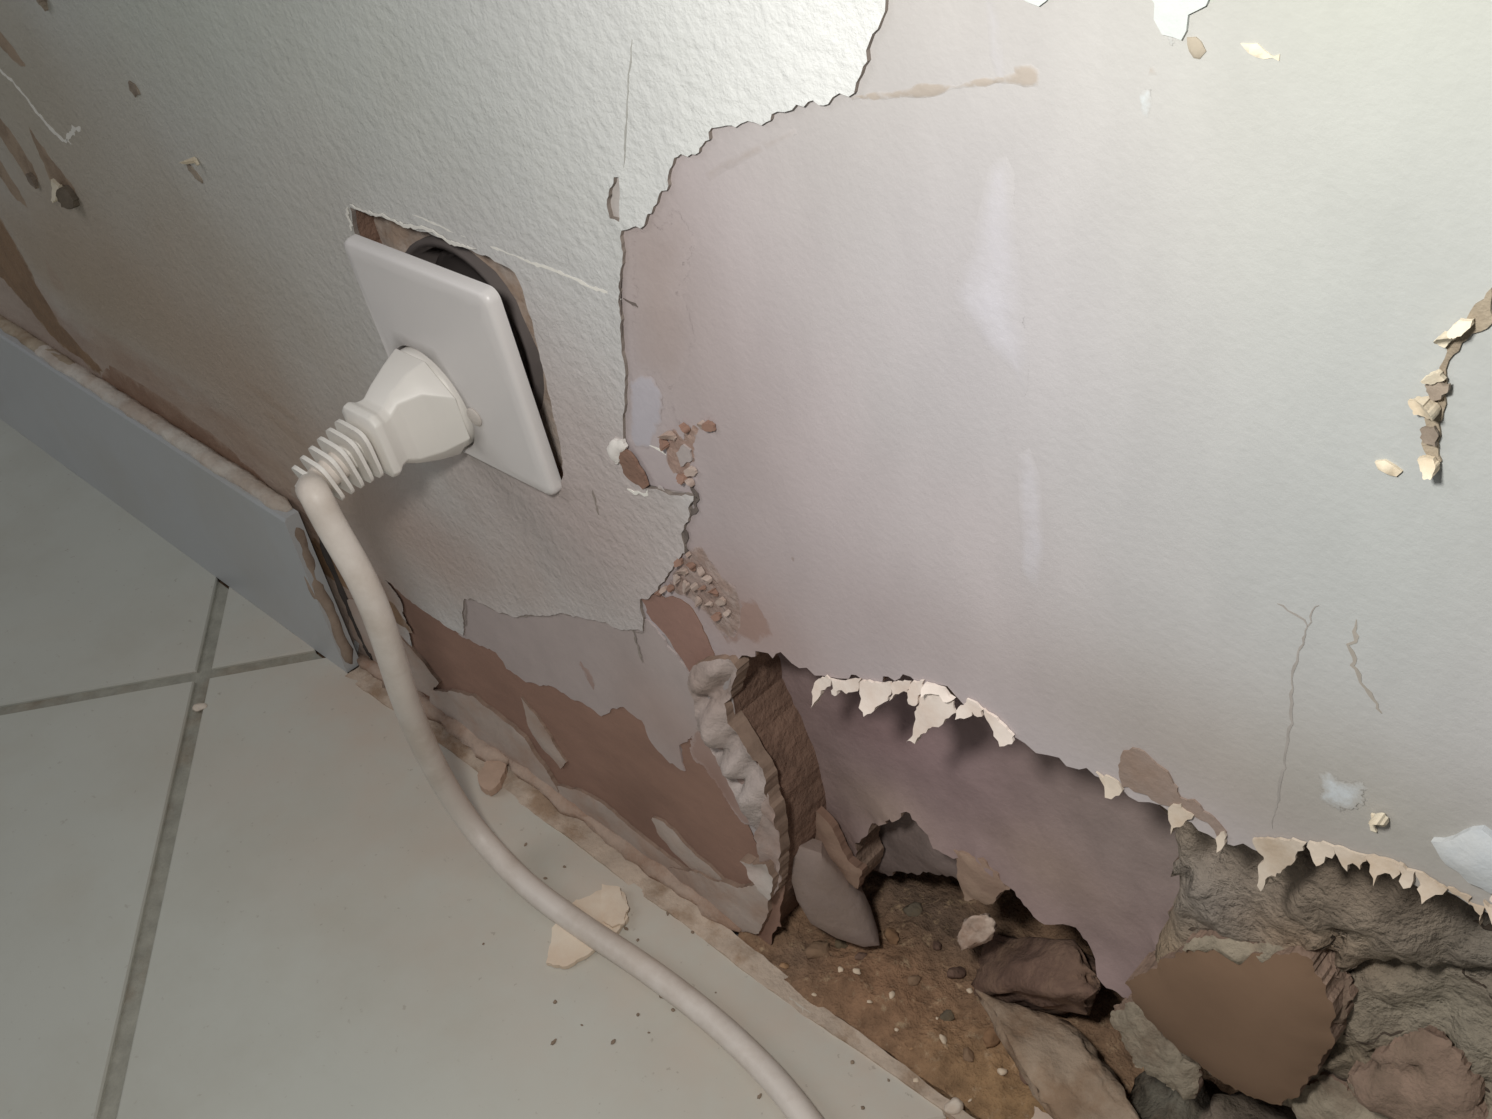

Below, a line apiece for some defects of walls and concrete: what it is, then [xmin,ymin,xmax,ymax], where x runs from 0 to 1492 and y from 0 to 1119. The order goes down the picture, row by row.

flaking render [347,598,386,688]
peeling [388,0,1492,1119]
crack [1271,603,1319,829]
crack [1346,619,1382,714]